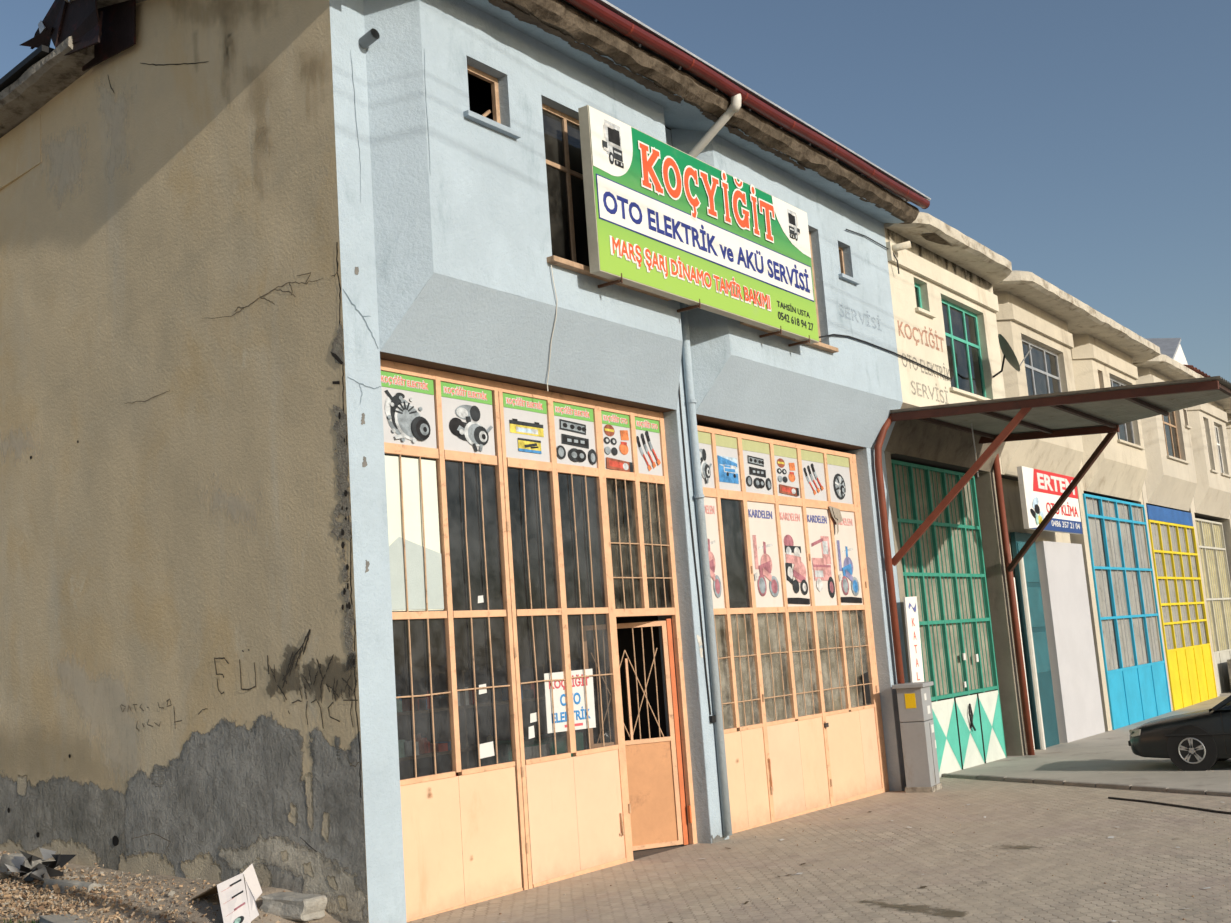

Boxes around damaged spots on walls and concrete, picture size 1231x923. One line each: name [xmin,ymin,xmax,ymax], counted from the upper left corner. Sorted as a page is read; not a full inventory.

crack [141,59,209,67]
crack [211,244,378,347]
crack [342,364,381,445]
crack [345,516,361,798]
peeling [0,713,368,923]